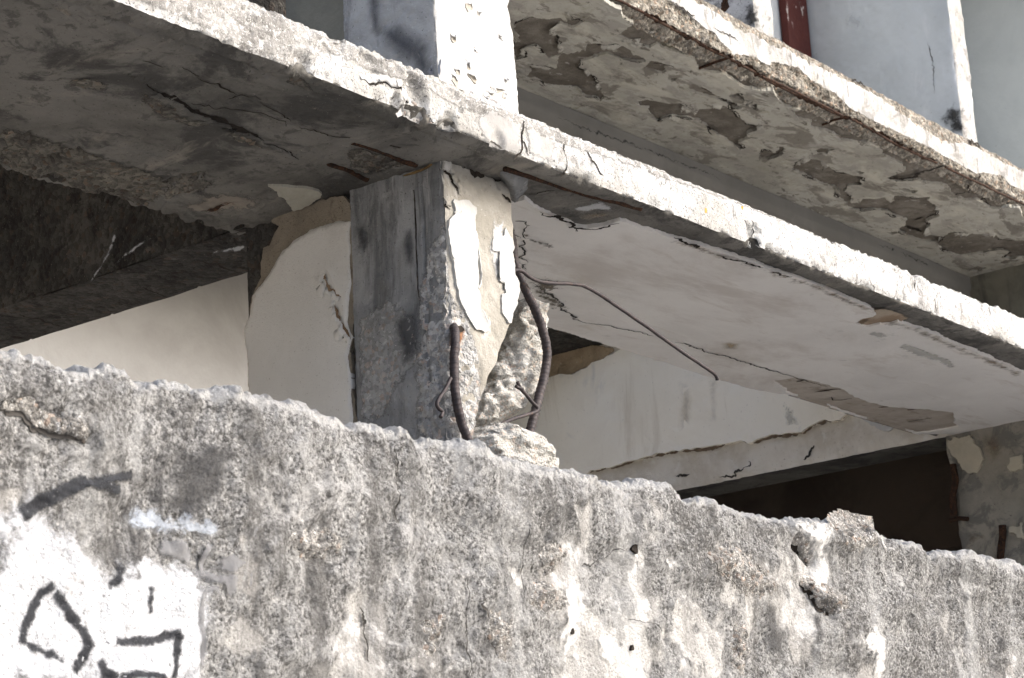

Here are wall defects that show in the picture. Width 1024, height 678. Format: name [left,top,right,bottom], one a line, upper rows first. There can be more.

crack [128,61,350,161]
crack [360,74,409,117]
spalling [427,12,673,162]
spalling [638,85,762,151]
spalling [725,46,969,177]
spalling [793,148,1017,260]
crack [674,237,789,277]
spalling [358,199,520,442]
spalling [549,345,614,377]
crack [589,417,845,478]
spalling [775,378,985,474]
flaking render [1007,522,1024,539]